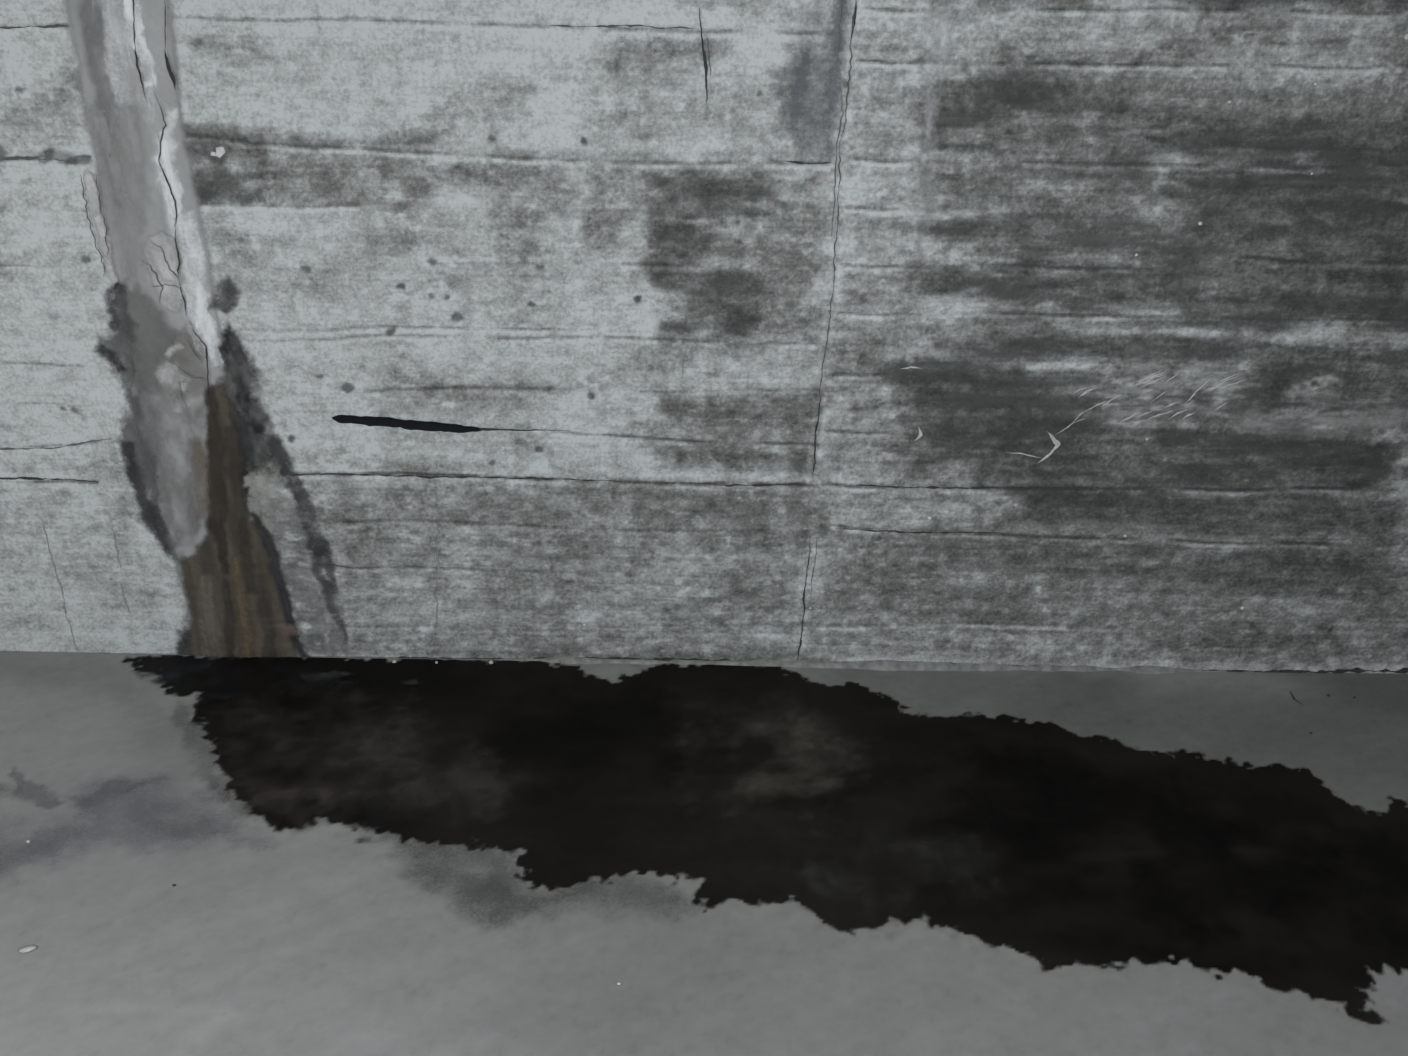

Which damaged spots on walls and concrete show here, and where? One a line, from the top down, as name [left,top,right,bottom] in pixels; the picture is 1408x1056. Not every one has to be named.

crack [132,0,209,393]
peeling [144,232,205,414]
damp [95,0,348,643]
crack [695,0,857,487]
damp [826,0,846,106]
damp [885,316,1293,443]
damp [956,201,1408,351]
damp [1060,122,1408,216]
corrosion [181,385,308,658]
damp [122,600,1408,1024]